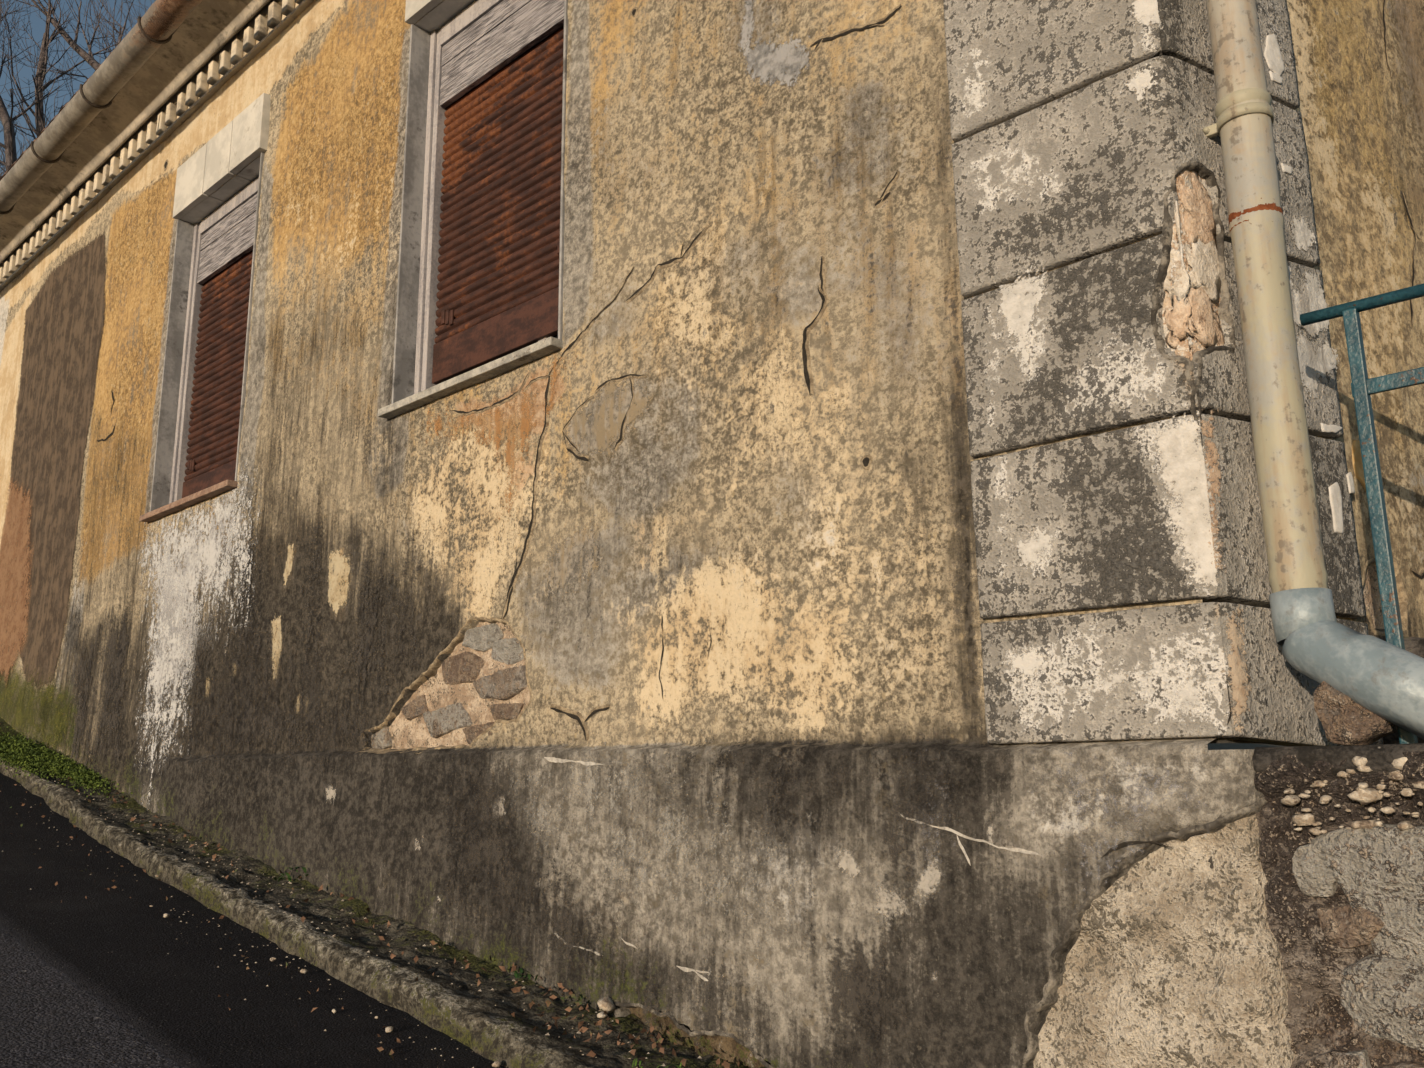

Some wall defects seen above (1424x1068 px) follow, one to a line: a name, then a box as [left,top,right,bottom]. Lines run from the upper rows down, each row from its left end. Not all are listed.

crack [1383,0,1392,78]
crack [1402,192,1420,326]
crack [450,225,710,619]
spalling [1151,162,1236,587]
spalling [356,616,532,754]
spalling [1224,606,1251,732]
crack [554,933,637,956]
crack [677,966,709,981]
damp [438,737,954,1040]
damp [805,911,909,1068]
crack [898,812,1046,866]
crack [1101,841,1172,858]